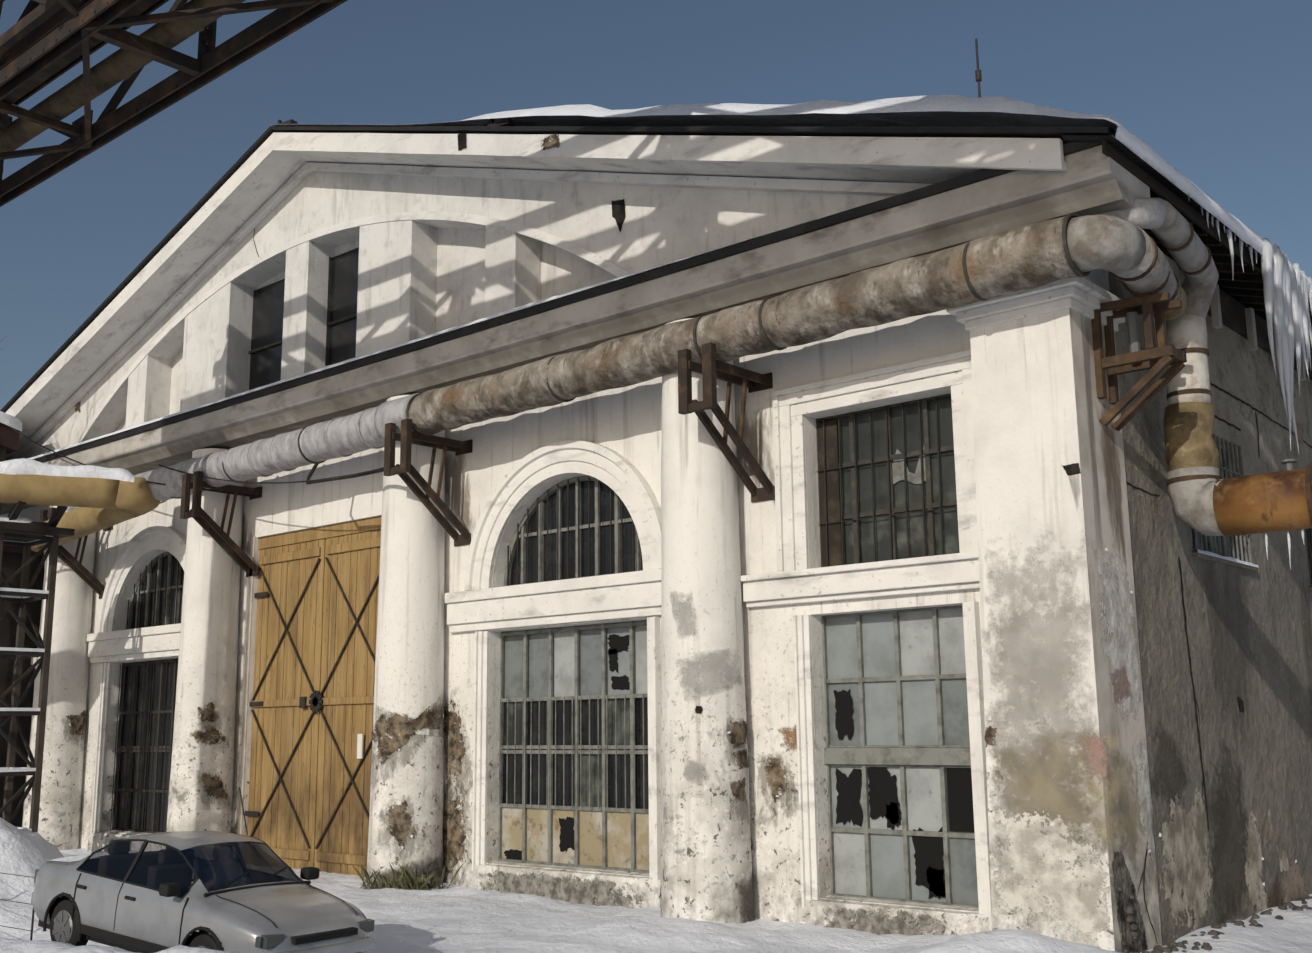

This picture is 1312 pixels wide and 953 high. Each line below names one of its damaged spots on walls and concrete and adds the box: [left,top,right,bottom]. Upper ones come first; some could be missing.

flaking render [66,710,88,738]
flaking render [187,702,227,746]
flaking render [201,773,228,799]
flaking render [371,700,467,881]
flaking render [684,762,704,781]
flaking render [725,719,797,803]
peeling [984,540,1213,953]
leakage [1153,731,1187,810]
crack [1179,558,1209,830]
flaking render [474,869,647,909]
flaking render [1244,809,1308,914]